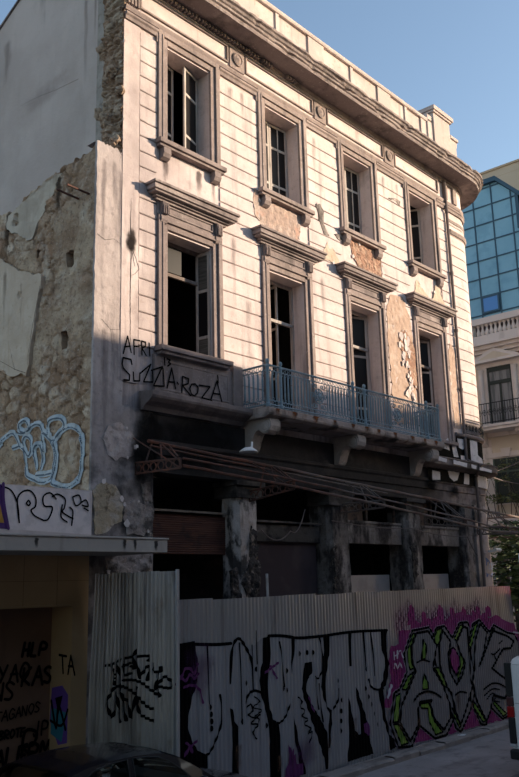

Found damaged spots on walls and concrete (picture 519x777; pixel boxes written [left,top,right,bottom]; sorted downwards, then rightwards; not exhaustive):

flaking render [94,0,125,156]
spalling [252,187,301,240]
spalling [315,202,385,277]
peeling [386,295,419,425]
spalling [102,422,138,461]
spalling [92,478,154,537]